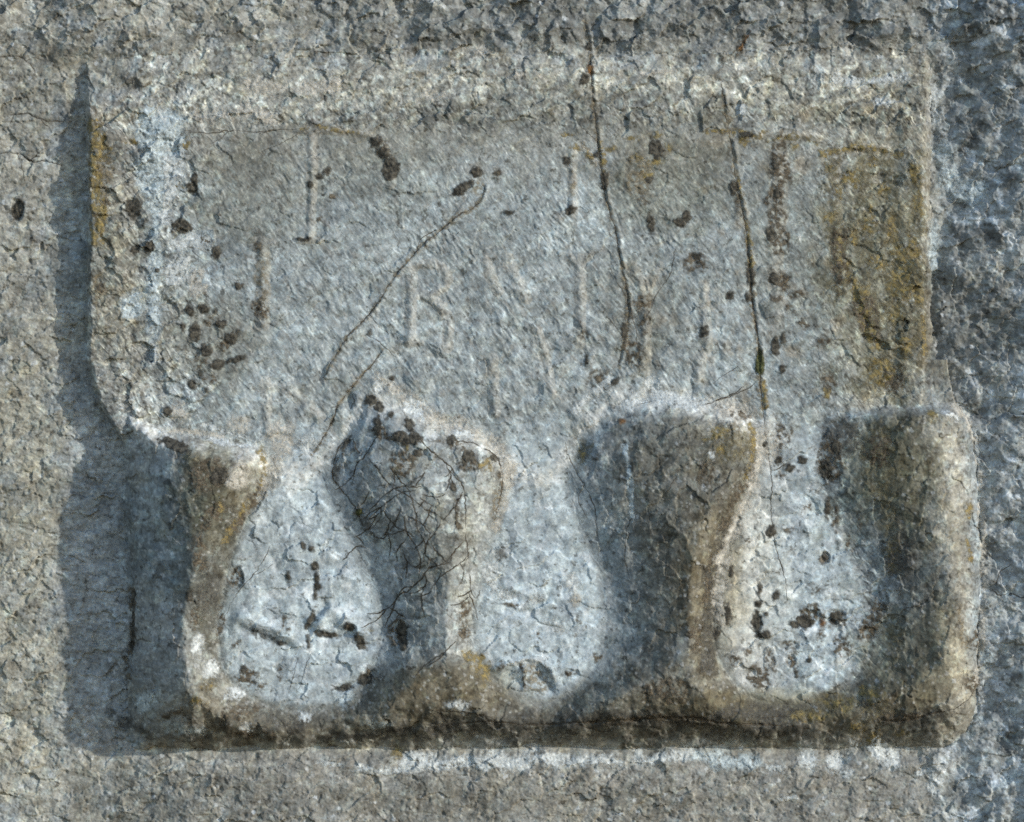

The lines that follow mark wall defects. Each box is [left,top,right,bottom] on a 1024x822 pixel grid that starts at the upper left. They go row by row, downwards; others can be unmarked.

crack [311,187,503,628]
crack [414,641,456,678]
crack [579,20,676,372]
crack [703,78,765,424]
crack [768,454,788,601]